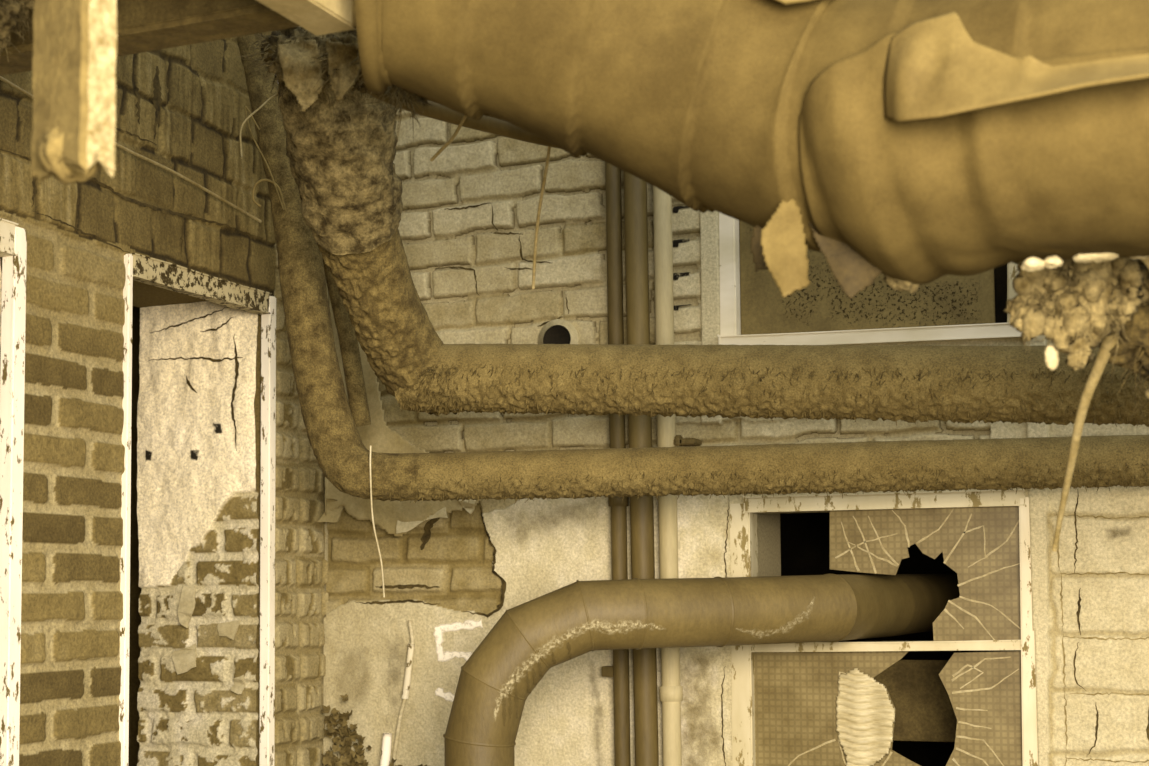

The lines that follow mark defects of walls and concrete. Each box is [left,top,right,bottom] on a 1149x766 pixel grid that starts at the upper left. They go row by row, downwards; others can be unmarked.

crack [149,307,243,451]
peeling [357,342,430,454]
flaking render [318,477,506,618]
peeling [172,643,197,675]
peeling [178,585,196,628]
peeling [218,620,241,640]
crack [1056,494,1149,766]